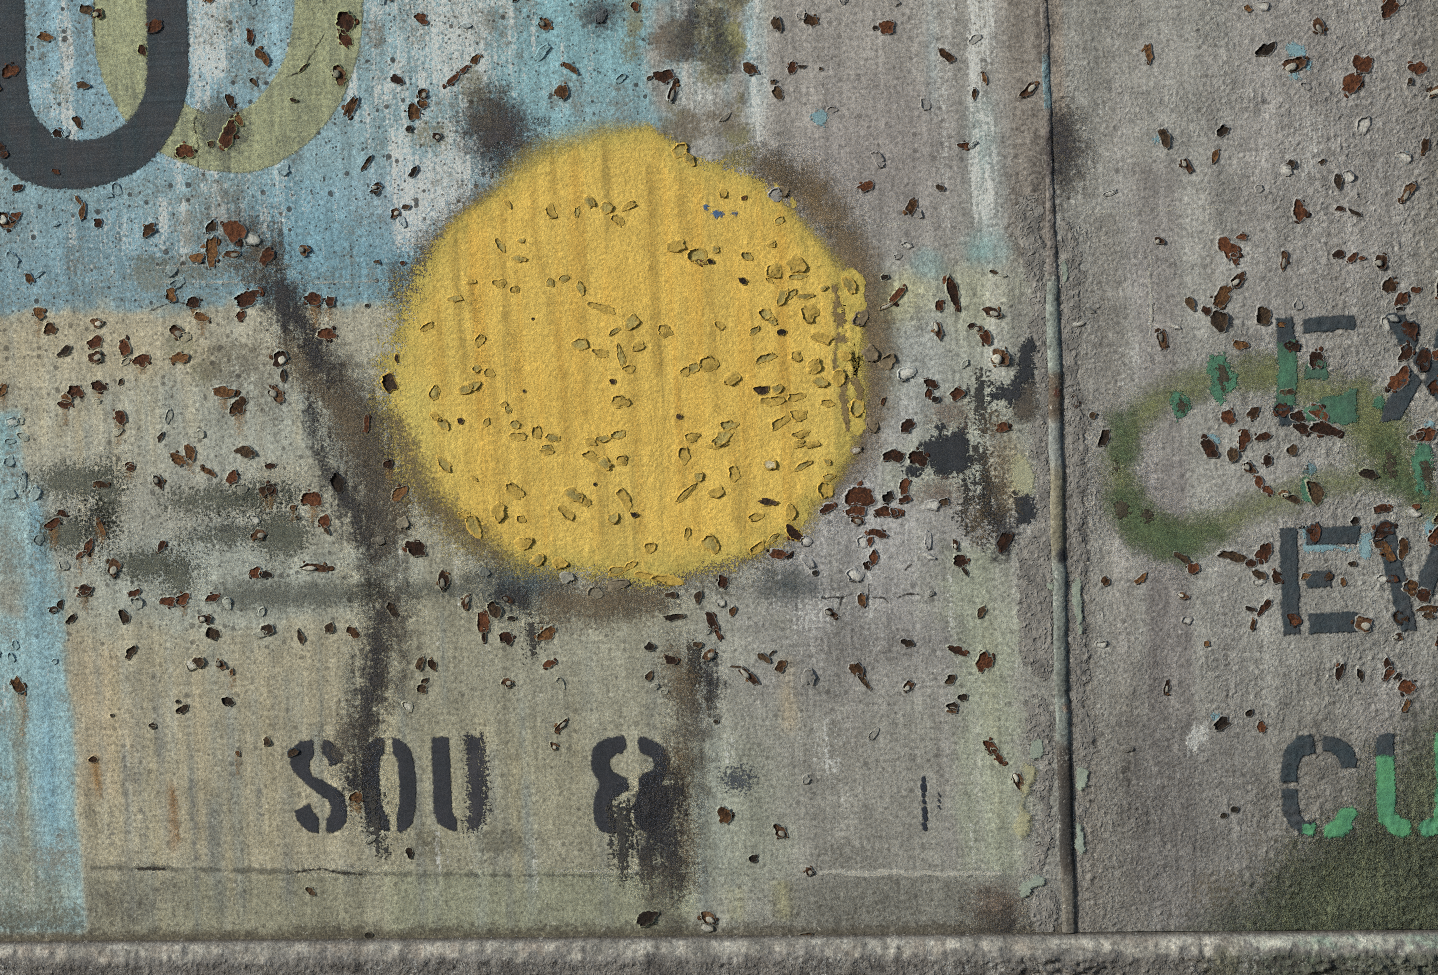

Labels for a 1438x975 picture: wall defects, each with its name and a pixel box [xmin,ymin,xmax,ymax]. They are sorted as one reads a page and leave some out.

spalling [1253,40,1309,73]
spalling [1156,127,1194,174]
spalling [1254,305,1273,327]
spalling [266,349,289,405]
spalling [380,353,400,394]
peeling [835,268,894,455]
peeling [1184,295,1239,406]
water stain [258,264,785,862]
spalling [47,598,77,624]
spalling [196,614,222,641]
spalling [691,641,776,686]
water stain [597,639,726,935]